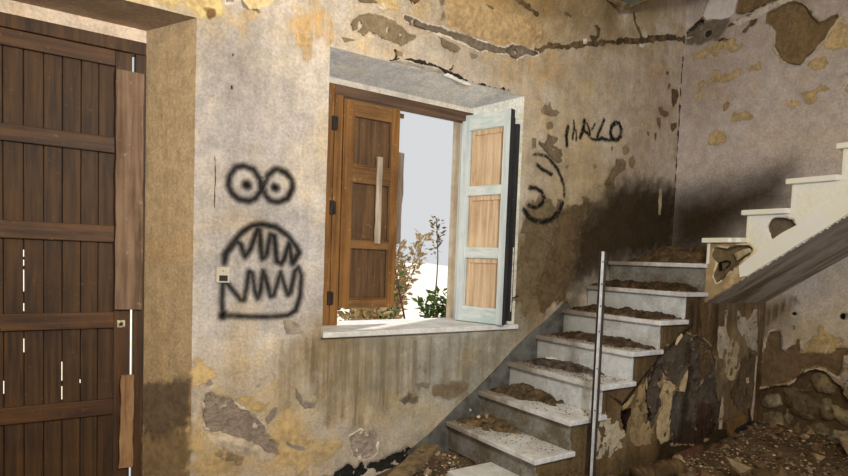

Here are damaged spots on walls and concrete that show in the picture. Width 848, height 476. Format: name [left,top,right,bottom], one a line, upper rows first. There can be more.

peeling [158,0,238,19]
spalling [342,0,540,61]
crack [515,0,539,17]
spalling [685,0,848,71]
crack [390,49,509,91]
crack [534,12,685,235]
peeling [723,102,753,122]
peeling [780,86,829,107]
water stain [516,175,781,316]
spalling [187,358,305,476]
spalling [295,388,316,409]
spalling [594,309,848,476]